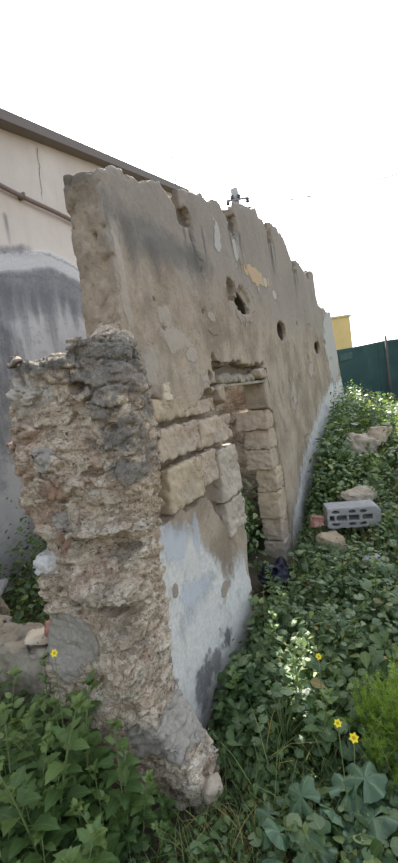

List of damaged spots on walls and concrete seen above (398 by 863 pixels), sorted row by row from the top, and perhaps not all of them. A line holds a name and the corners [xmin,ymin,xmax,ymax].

peeling [212,218,222,252]
leakage [0,269,82,311]
spalling [232,238,277,326]
leakage [6,330,141,416]
leakage [196,628,232,713]